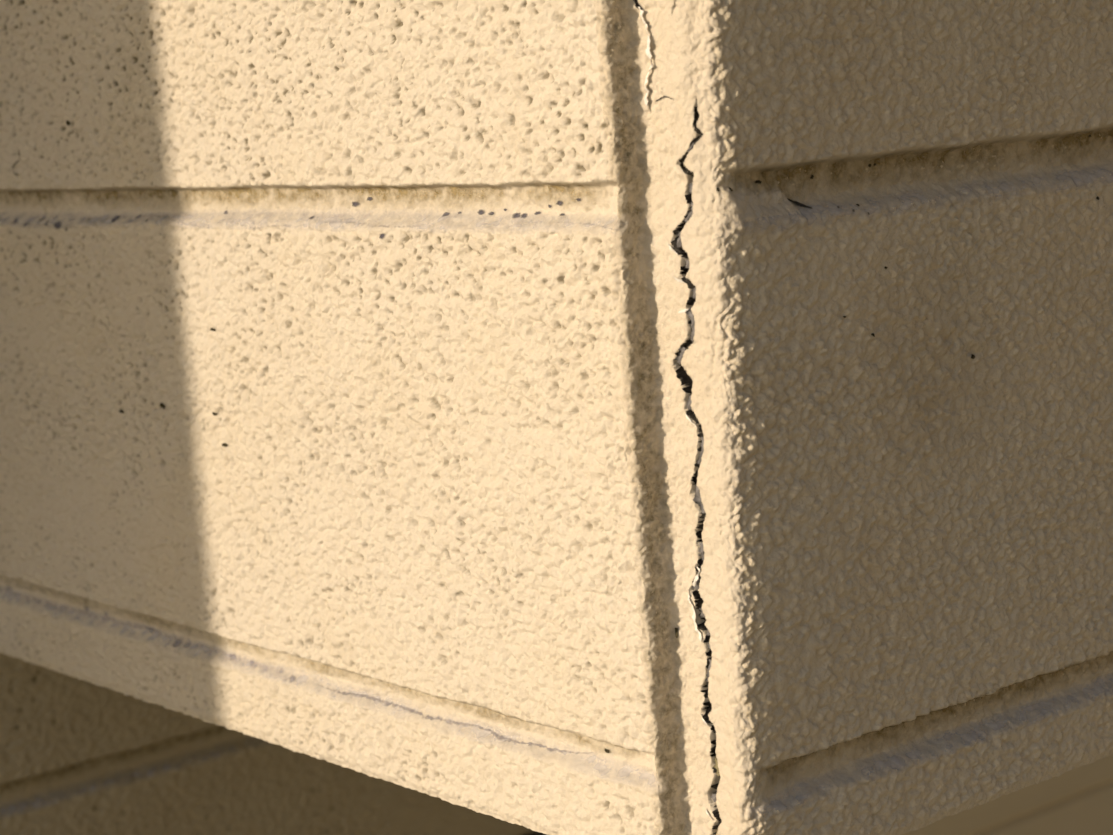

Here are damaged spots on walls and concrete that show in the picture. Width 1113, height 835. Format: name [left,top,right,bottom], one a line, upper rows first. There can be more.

crack [668,99,722,834]